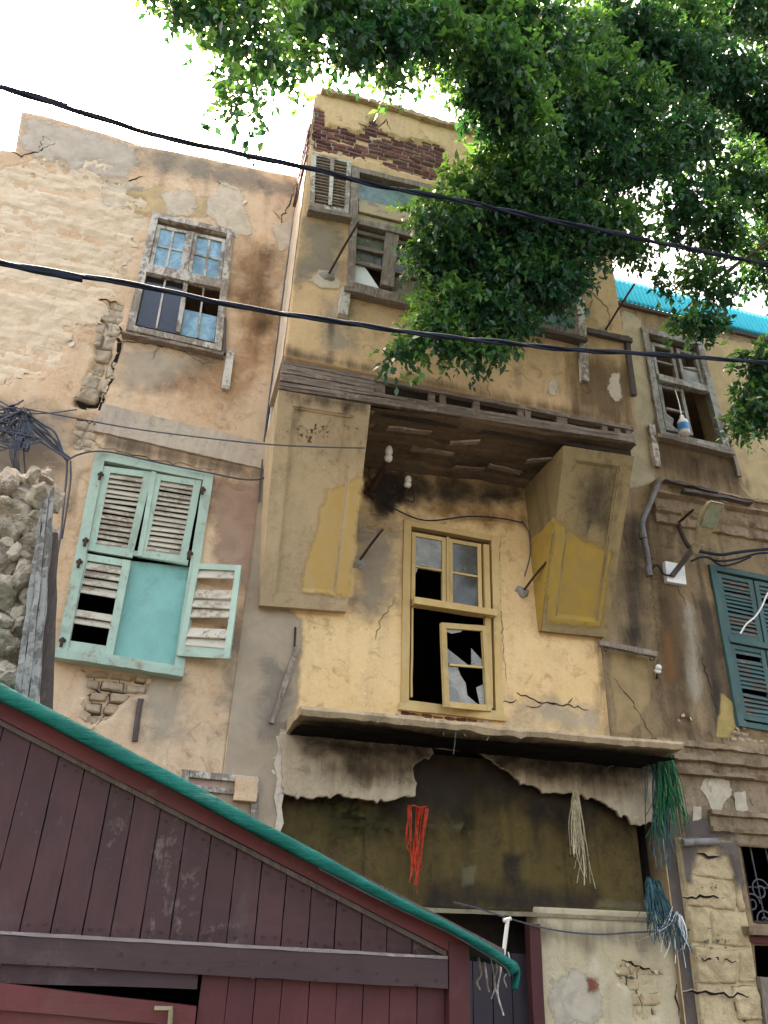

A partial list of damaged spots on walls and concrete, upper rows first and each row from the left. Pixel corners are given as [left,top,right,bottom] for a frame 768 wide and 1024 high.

crack [9,136,55,157]
spalling [311,108,454,182]
peeling [0,157,167,475]
peeling [607,310,656,488]
peeling [302,478,396,612]
crack [375,597,397,640]
crack [500,600,589,710]
crack [614,503,719,738]
peeling [693,778,748,821]
crack [698,851,719,859]
crack [683,892,724,900]
peeling [548,968,603,1024]